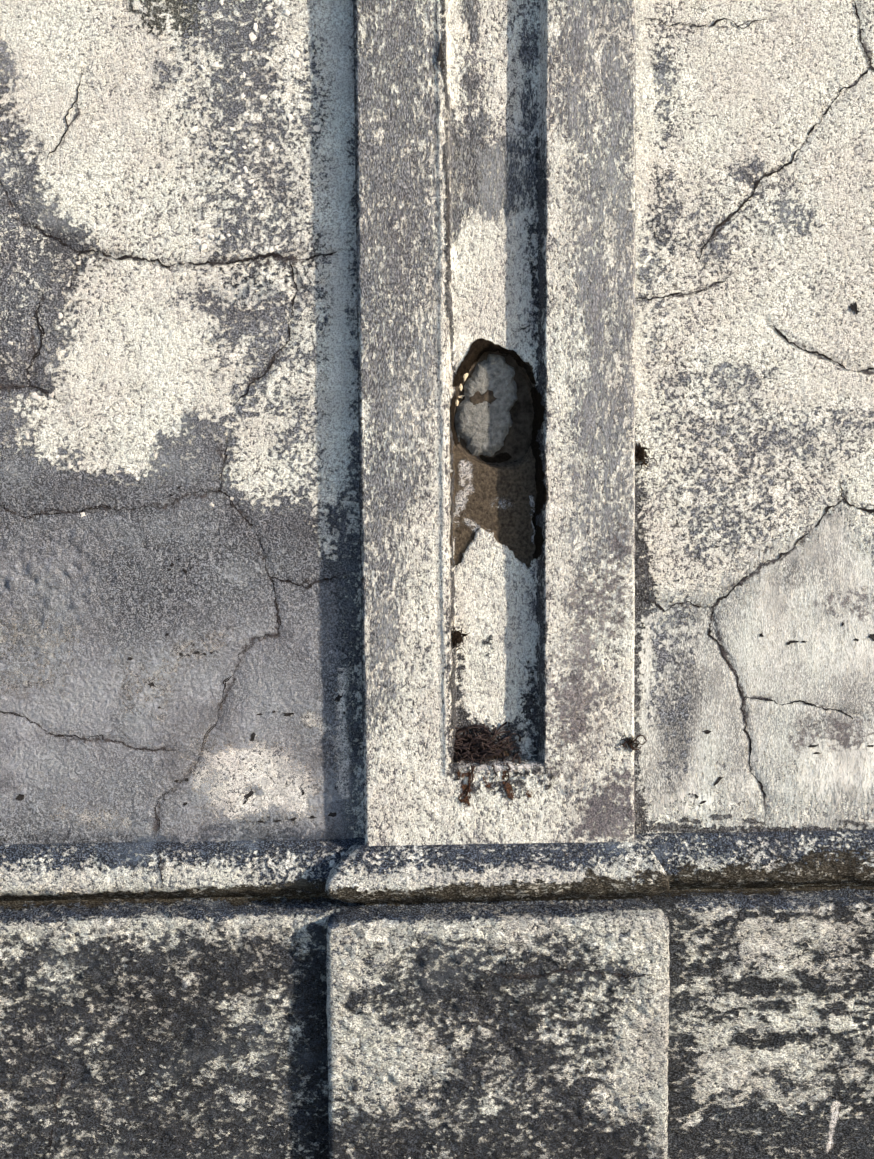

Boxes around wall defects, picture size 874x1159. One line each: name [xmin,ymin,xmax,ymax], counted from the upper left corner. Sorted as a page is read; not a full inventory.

crack [44,73,83,167]
crack [637,0,874,301]
crack [0,182,344,407]
spalling [450,338,547,568]
crack [768,323,874,375]
crack [0,441,339,887]
crack [640,480,874,826]
rust [456,763,532,806]